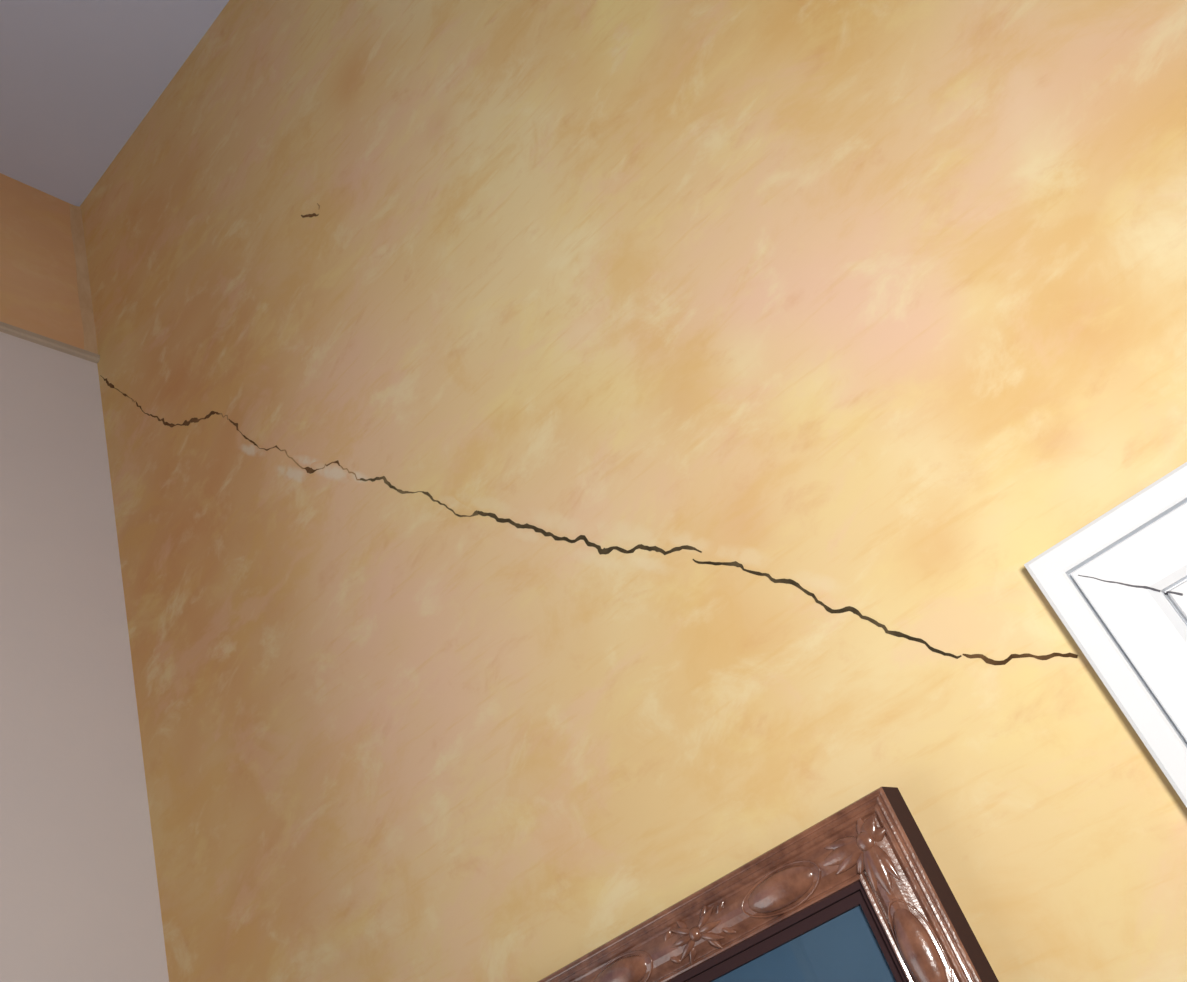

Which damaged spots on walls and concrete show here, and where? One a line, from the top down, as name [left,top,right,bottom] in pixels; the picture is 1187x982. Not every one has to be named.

crack [100,375,1078,665]